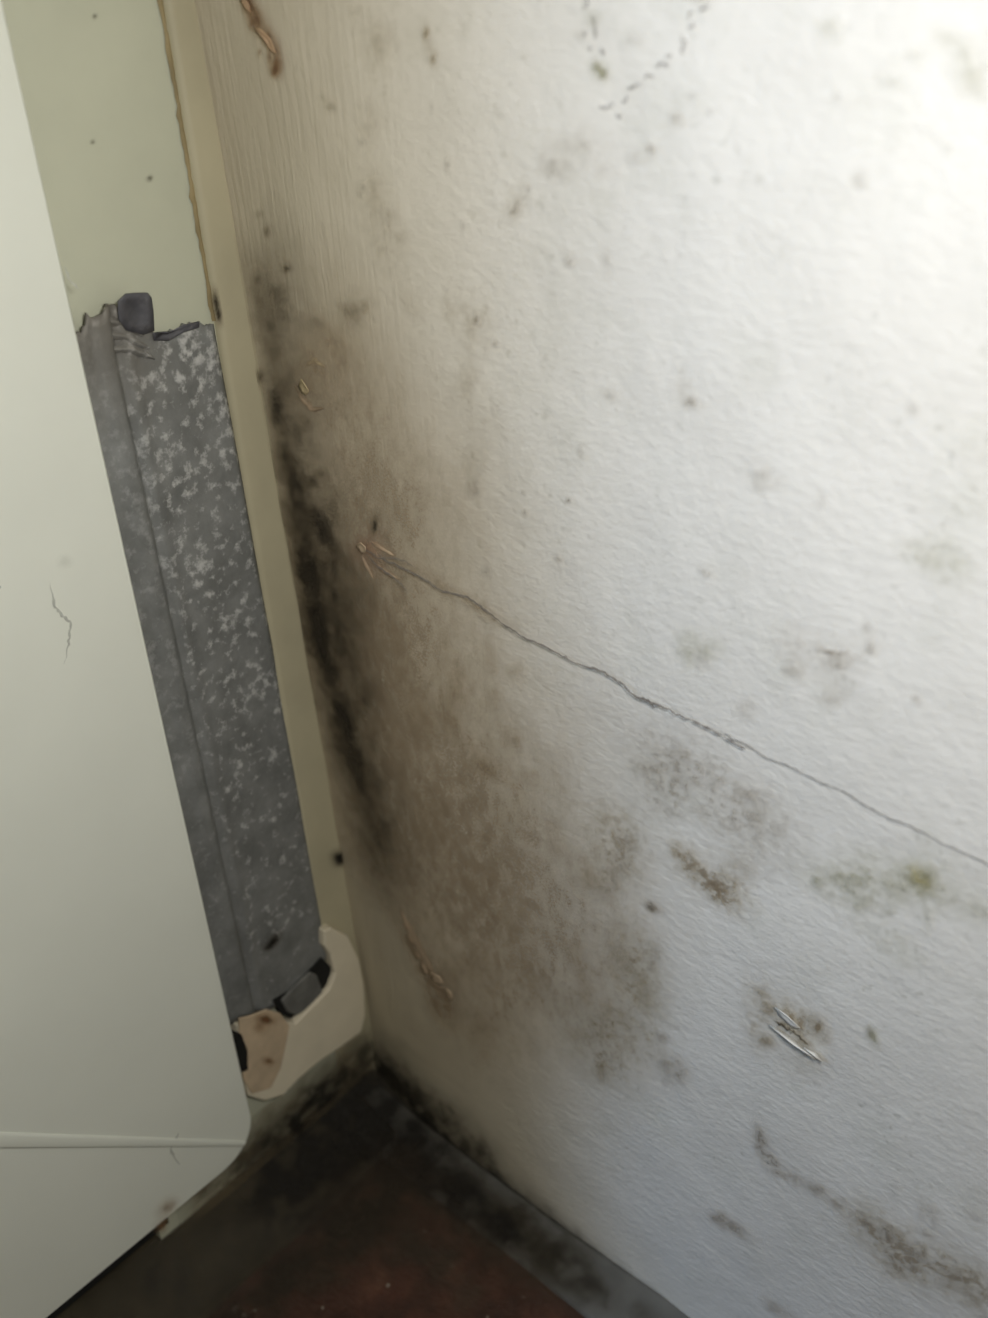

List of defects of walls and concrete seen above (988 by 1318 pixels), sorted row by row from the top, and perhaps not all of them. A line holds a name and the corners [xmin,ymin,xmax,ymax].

corrosion [240,0,280,75]
damp [258,338,609,1031]
crack [366,550,988,865]
damp [679,853,737,905]
damp [860,1219,985,1294]